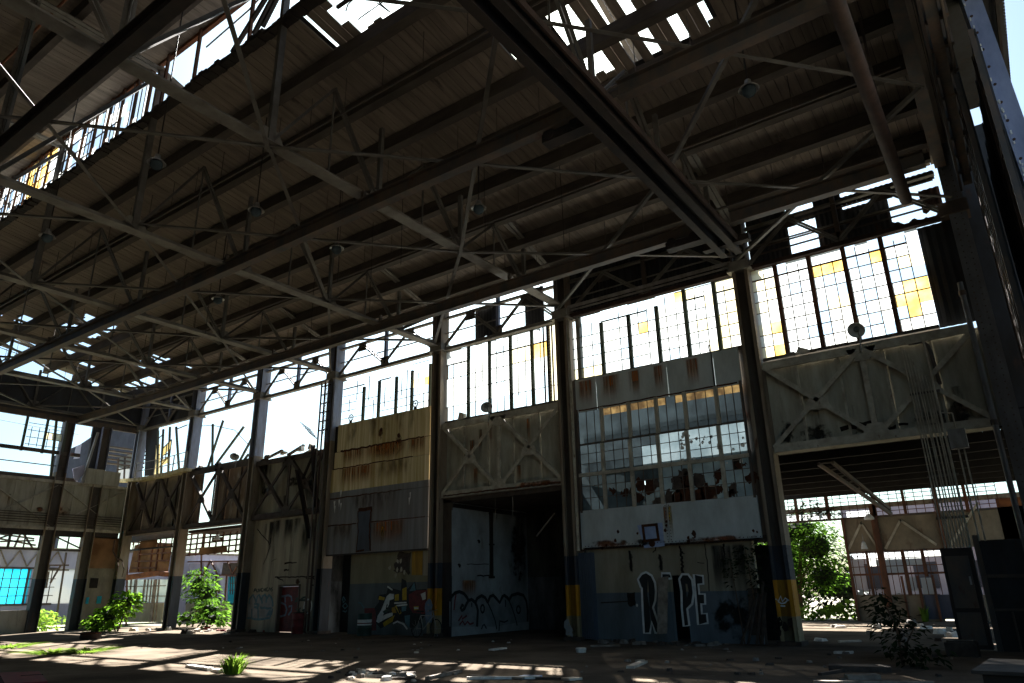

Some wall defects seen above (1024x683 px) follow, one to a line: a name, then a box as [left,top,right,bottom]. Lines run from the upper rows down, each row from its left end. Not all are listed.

corrosion [631,370,639,387]
corrosion [579,375,737,411]
corrosion [333,428,424,480]